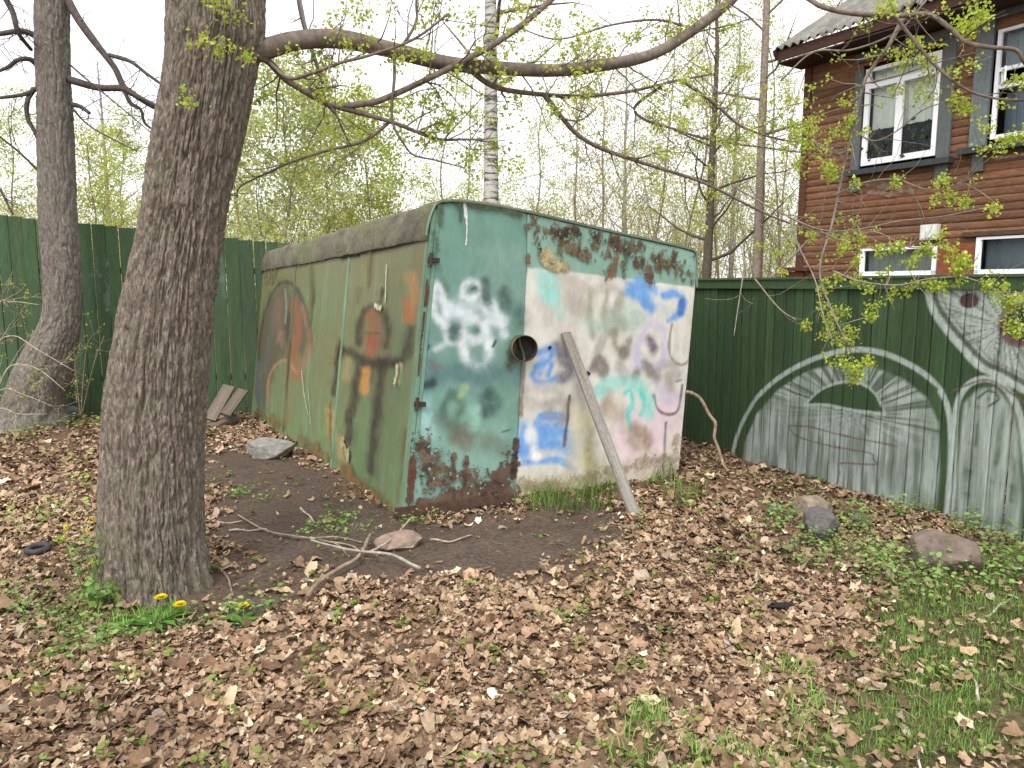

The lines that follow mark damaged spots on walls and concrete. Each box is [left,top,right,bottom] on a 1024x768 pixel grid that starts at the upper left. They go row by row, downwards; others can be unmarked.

corrosion [526,222,684,287]
corrosion [337,427,522,512]